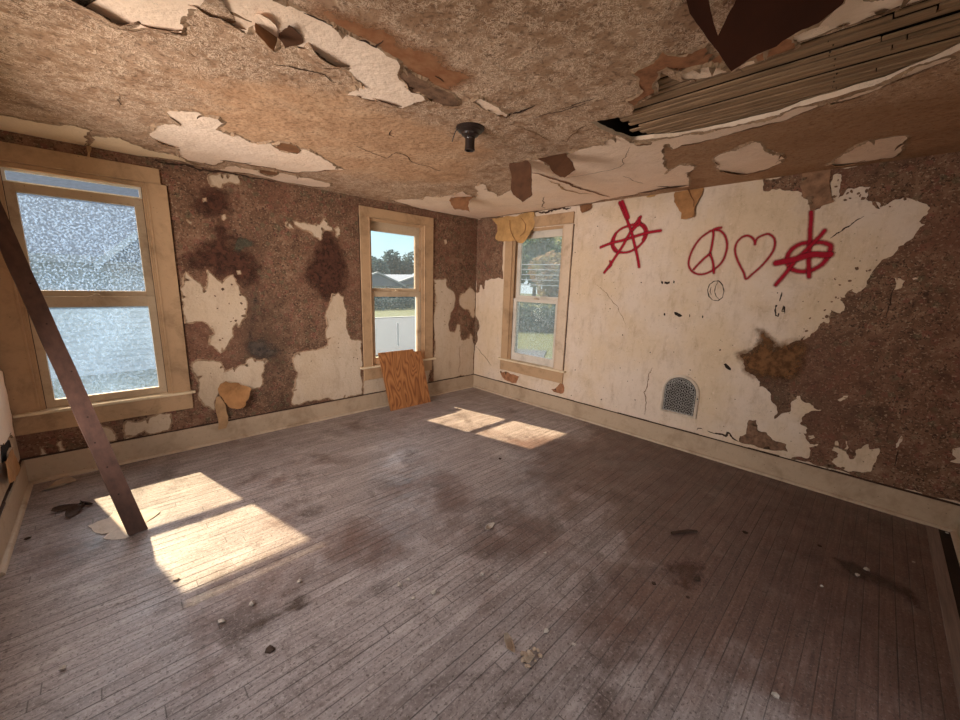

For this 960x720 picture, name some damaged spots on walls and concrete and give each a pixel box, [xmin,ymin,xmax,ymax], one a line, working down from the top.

peeling [86,0,204,36]
peeling [223,0,510,118]
peeling [0,108,345,188]
crack [534,150,639,214]
water stain [190,190,262,283]
peeling [285,218,341,241]
water stain [306,231,347,299]
peeling [388,0,960,502]
peeling [180,270,268,430]
peeling [291,293,386,405]
water stain [739,332,807,380]